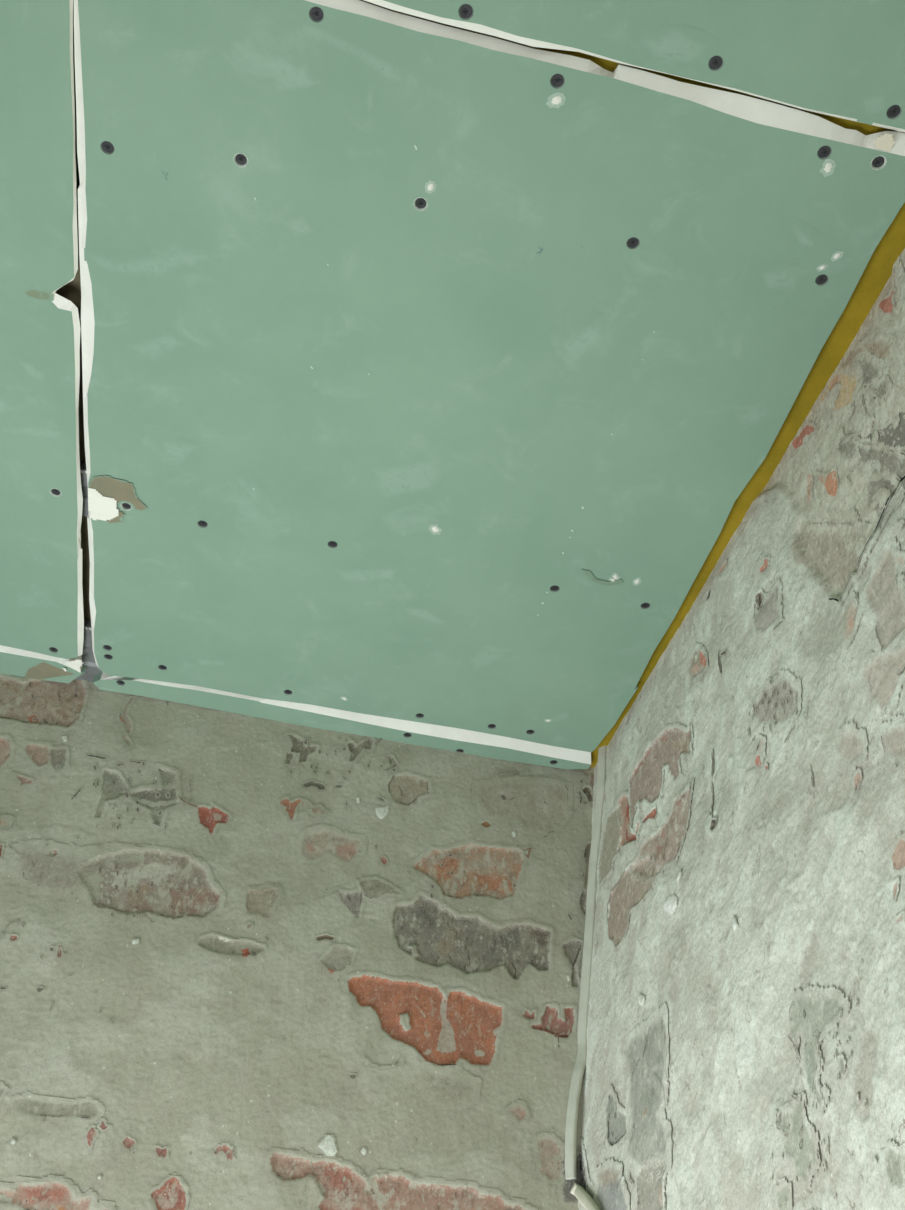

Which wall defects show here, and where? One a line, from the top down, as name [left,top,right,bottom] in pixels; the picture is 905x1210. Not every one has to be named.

spalling [745,255,905,664]
crack [828,451,905,603]
flaking render [0,673,233,841]
flaking render [567,722,694,952]
flaking render [45,843,284,959]
flaking render [314,820,584,1071]
flaking render [0,1174,117,1210]
flaking render [153,1145,170,1160]
flaking render [147,1173,190,1210]
flaking render [211,1142,236,1166]
flaking render [264,1134,537,1210]